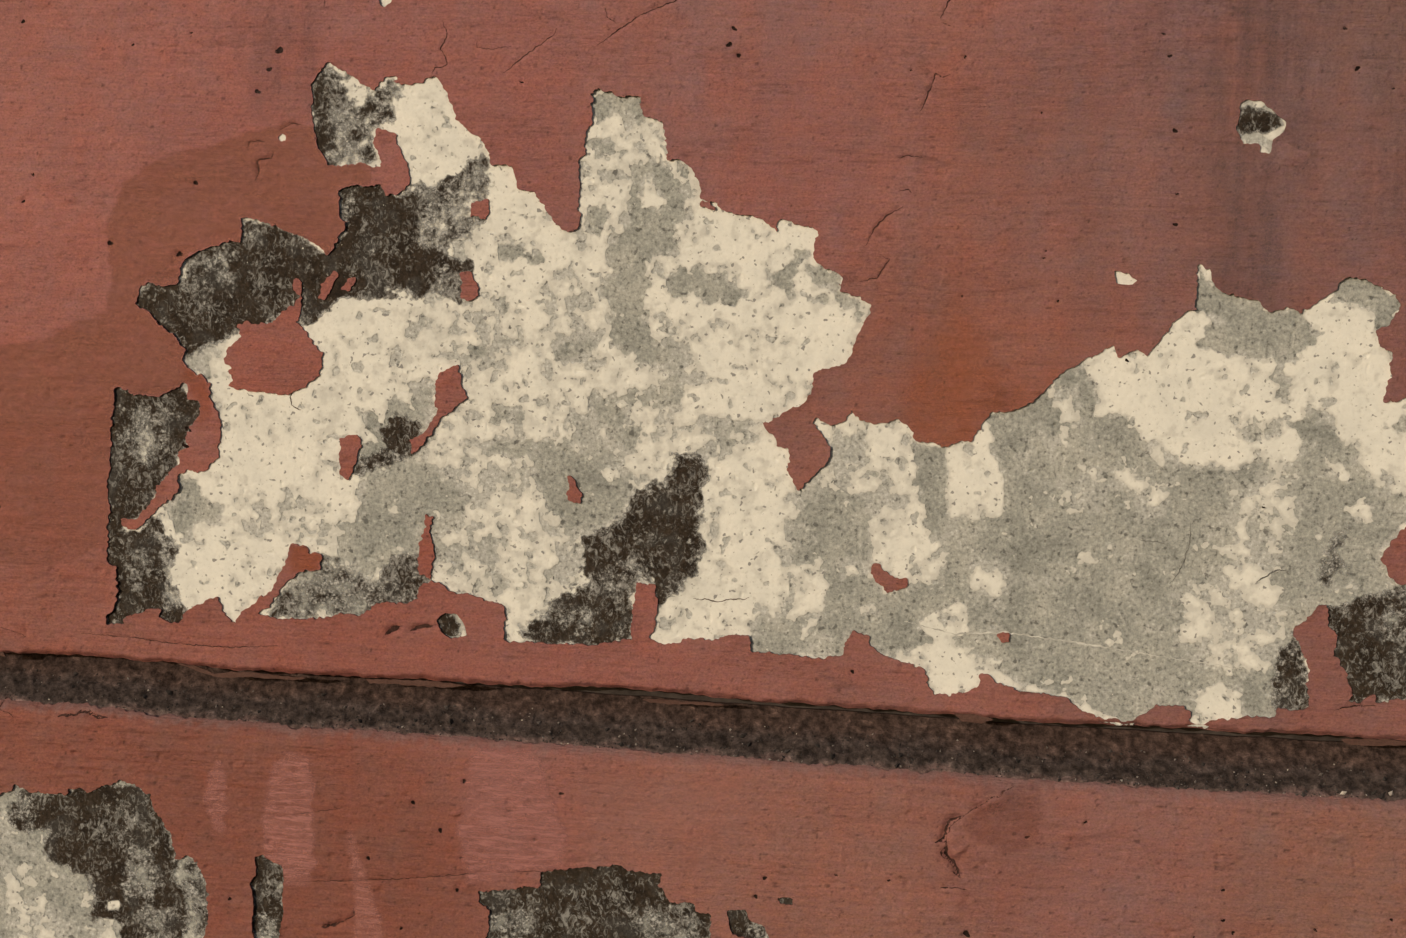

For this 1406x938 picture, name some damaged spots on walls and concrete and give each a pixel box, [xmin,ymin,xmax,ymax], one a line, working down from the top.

peeling [123,62,1406,729]
peeling [0,786,122,938]
peeling [130,847,162,938]
peeling [168,832,209,938]